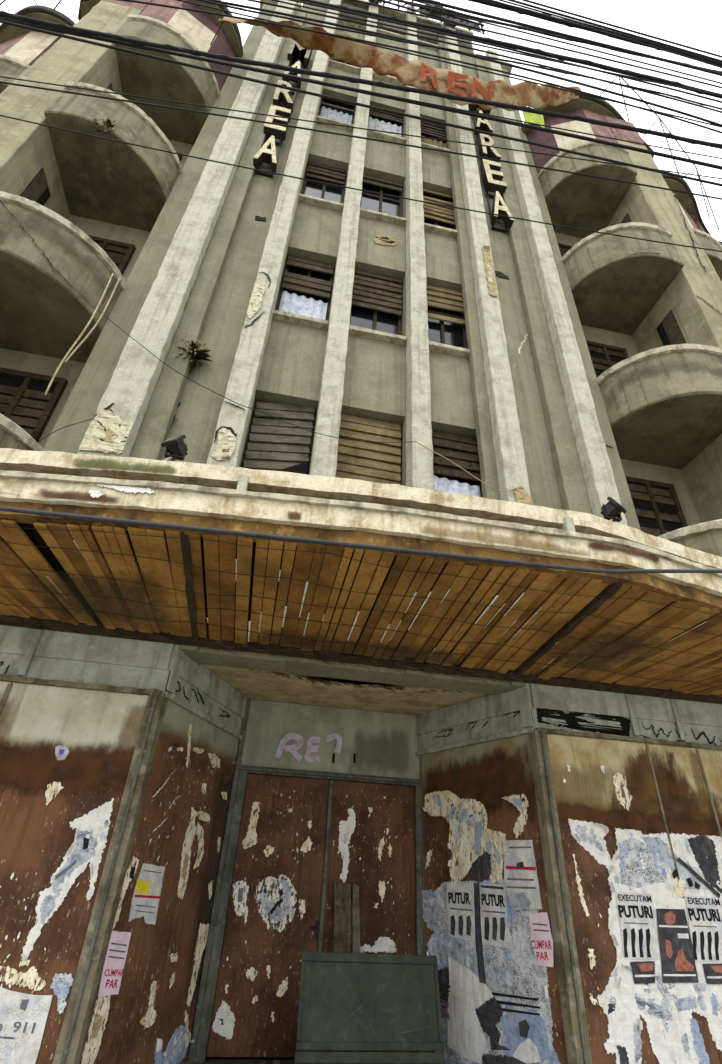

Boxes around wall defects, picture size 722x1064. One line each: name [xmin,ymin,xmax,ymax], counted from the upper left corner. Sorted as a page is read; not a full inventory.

spalling [247,280,265,319]
spalling [79,409,133,455]
spalling [211,426,237,461]
corrosion [39,489,117,502]
corrosion [589,542,659,562]